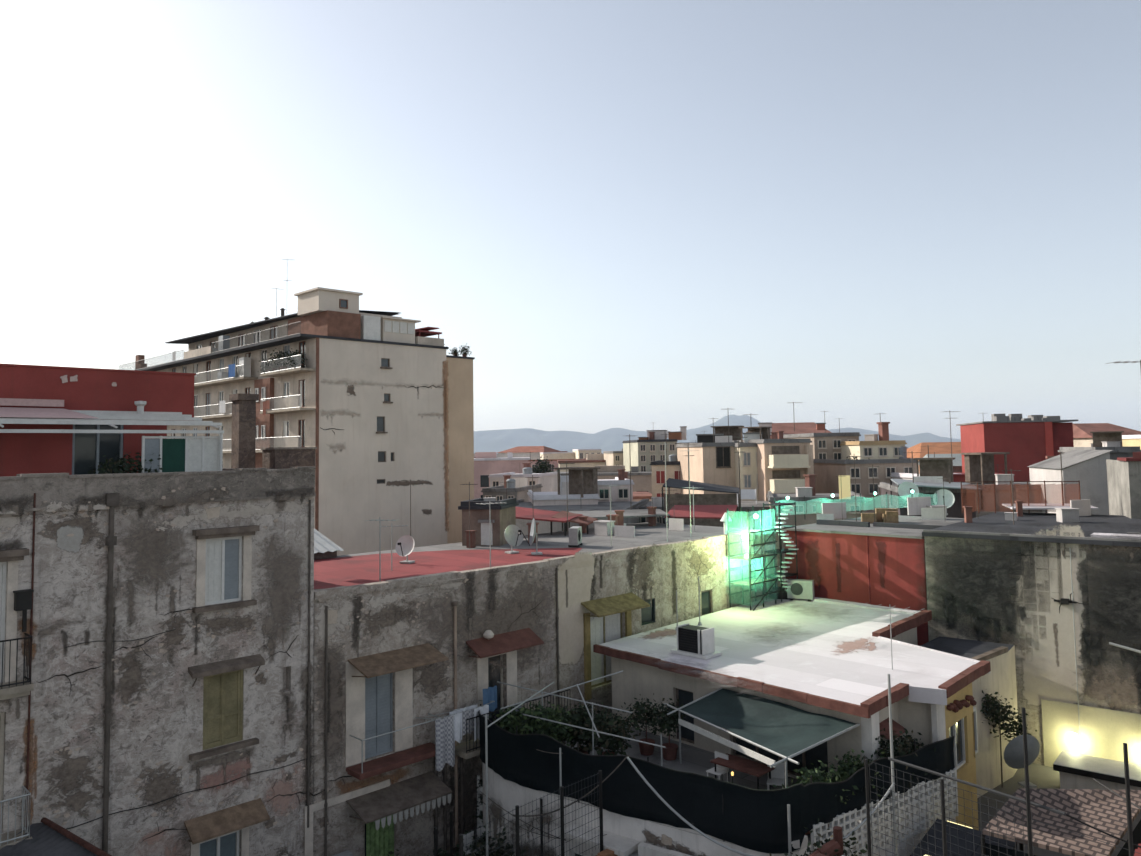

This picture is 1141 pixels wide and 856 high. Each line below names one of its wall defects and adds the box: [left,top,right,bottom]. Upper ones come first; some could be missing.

spalling [0,500,110,553]
leakage [38,621,89,655]
crack [36,609,193,696]
leakage [74,487,229,725]
leakage [257,487,313,662]
leakage [627,551,647,588]
leakage [926,531,1141,711]